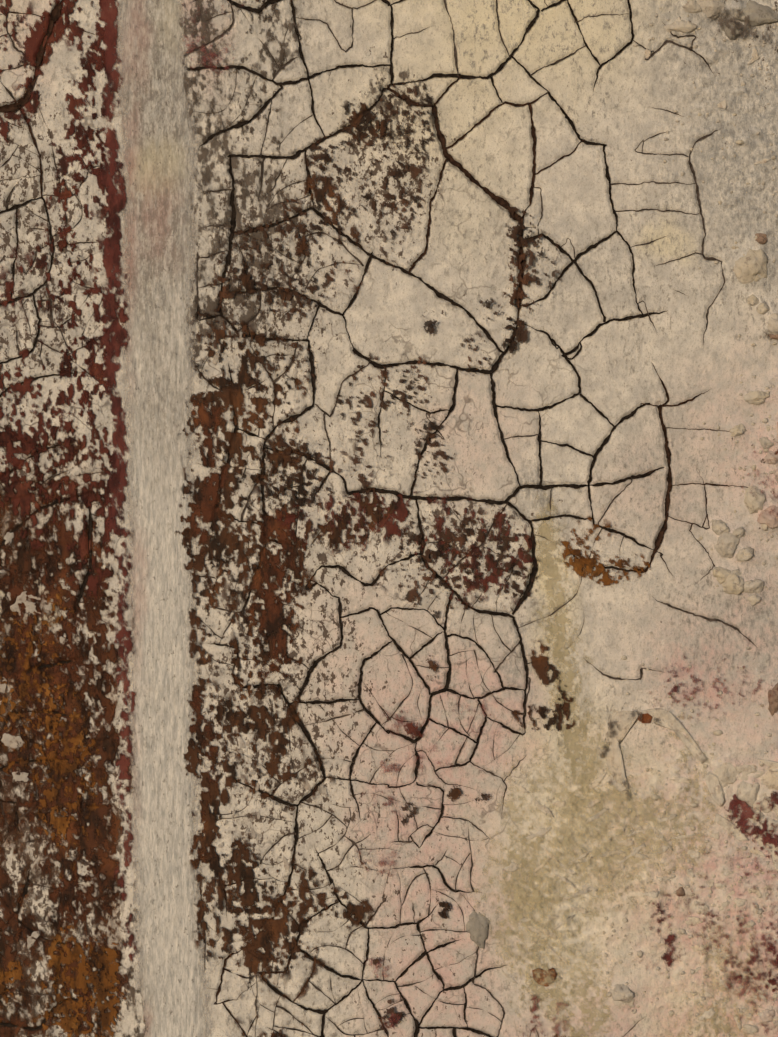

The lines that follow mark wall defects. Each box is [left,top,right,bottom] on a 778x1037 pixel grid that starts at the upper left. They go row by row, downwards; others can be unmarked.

crack [0,0,104,397]
crack [0,427,110,629]
crack [0,658,118,1037]
peeling [0,422,132,1037]
rust [0,0,135,901]
rust [0,913,137,1037]
peeling [175,80,455,1037]
peeling [376,541,487,620]
crack [182,0,757,1037]
peeling [457,207,561,376]
rust [560,516,651,587]